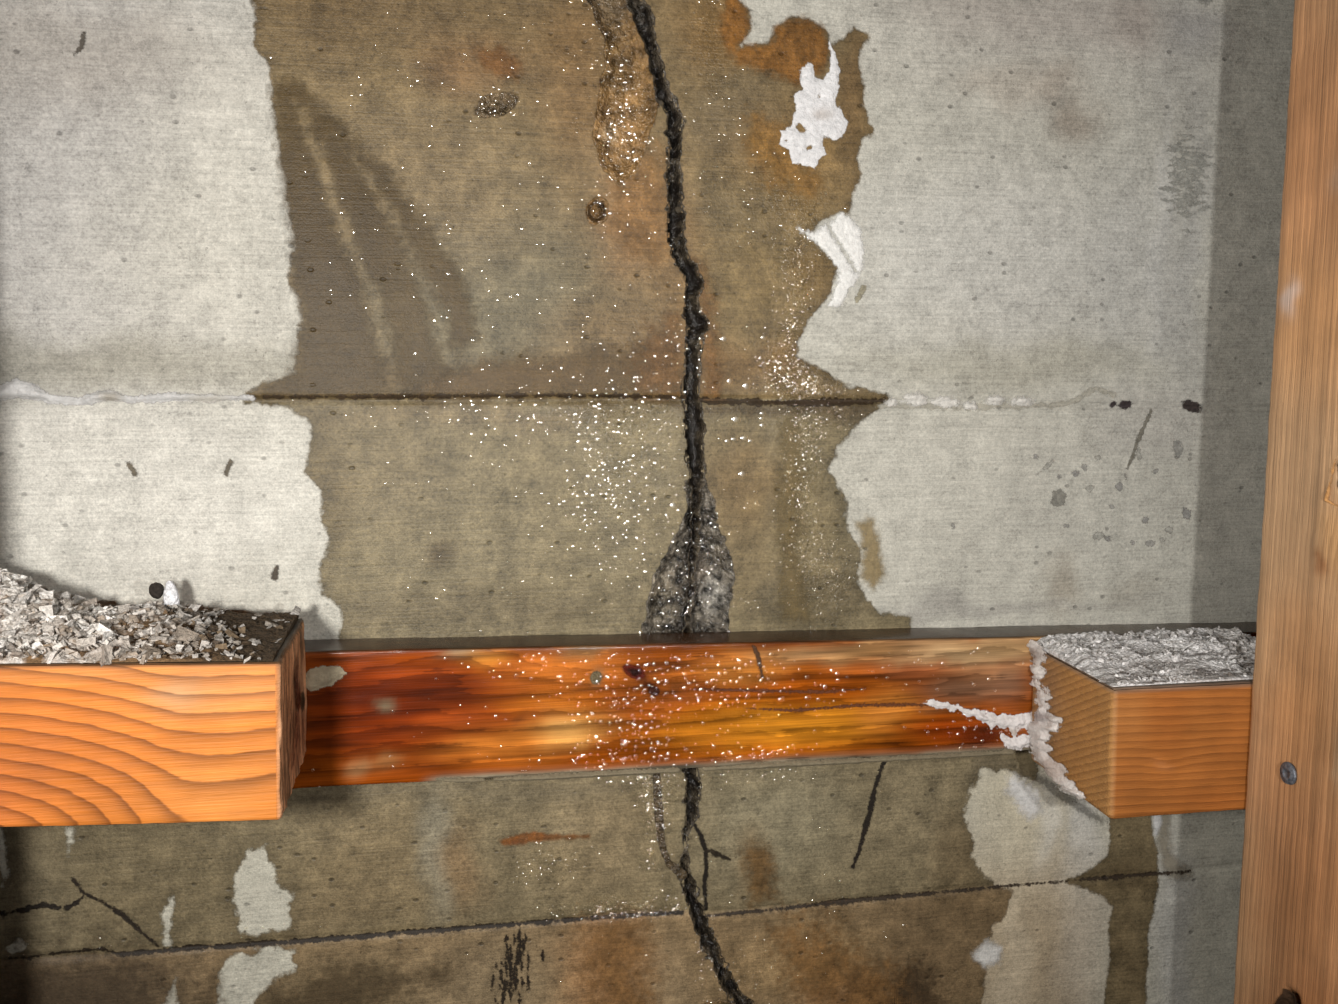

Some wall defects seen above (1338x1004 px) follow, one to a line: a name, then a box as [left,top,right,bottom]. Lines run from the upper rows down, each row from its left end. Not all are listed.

corrosion [721,0,827,83]
corrosion [750,115,820,196]
leakage [0,0,1115,639]
crack [626,0,710,633]
crack [0,878,159,947]
leakage [0,626,1256,1004]
crack [653,768,754,1004]
crack [851,762,886,868]